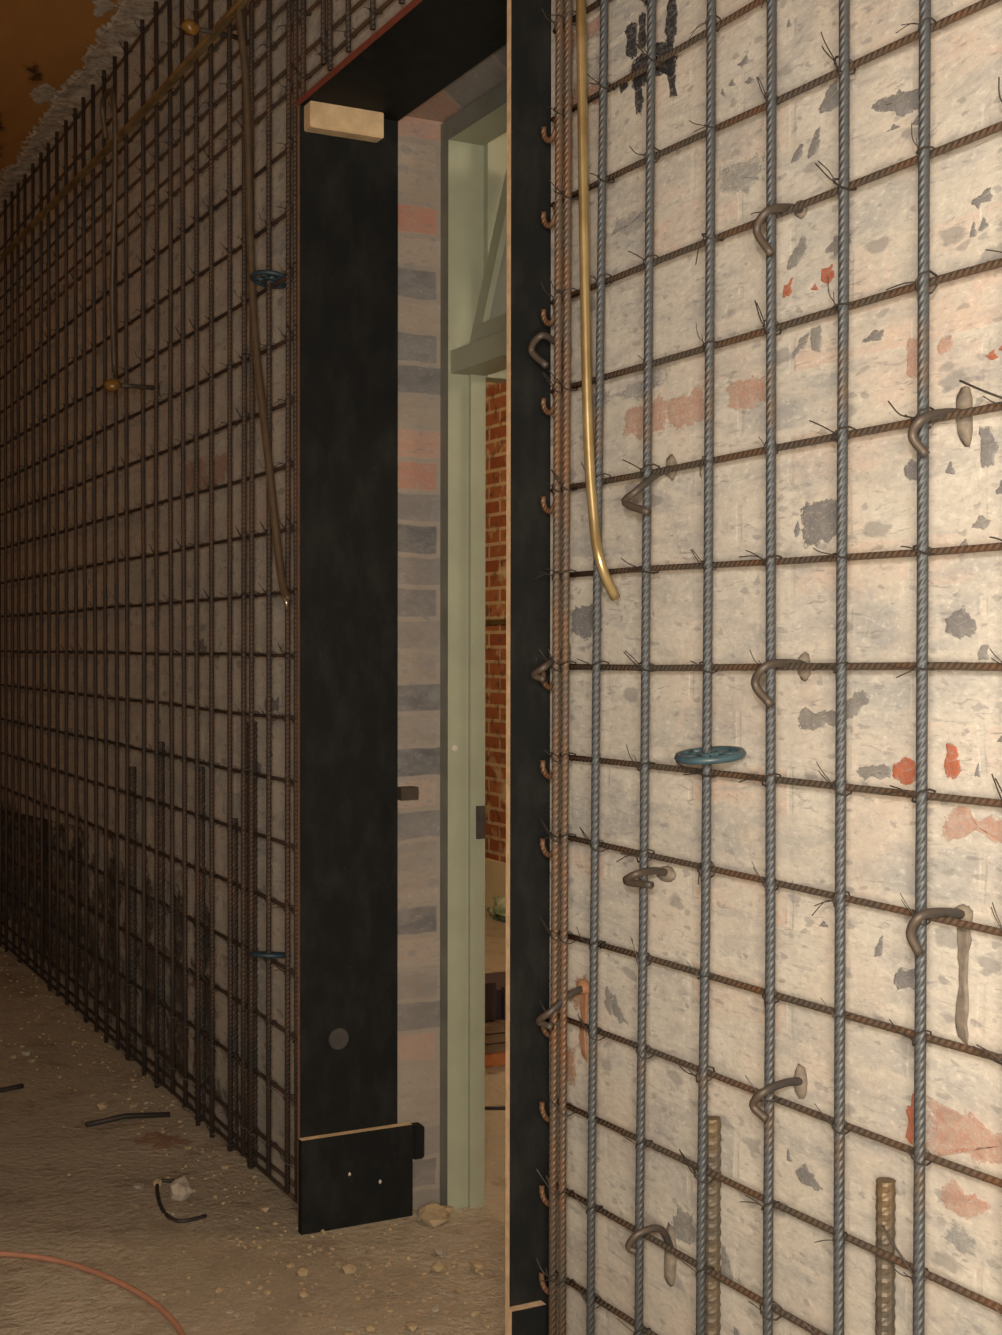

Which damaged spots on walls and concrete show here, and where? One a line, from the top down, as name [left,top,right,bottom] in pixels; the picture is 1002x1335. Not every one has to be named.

leakage [619,74,644,115]
leakage [624,0,647,59]
leakage [664,0,678,98]
spalling [0,0,405,1210]
spalling [534,0,1002,1335]